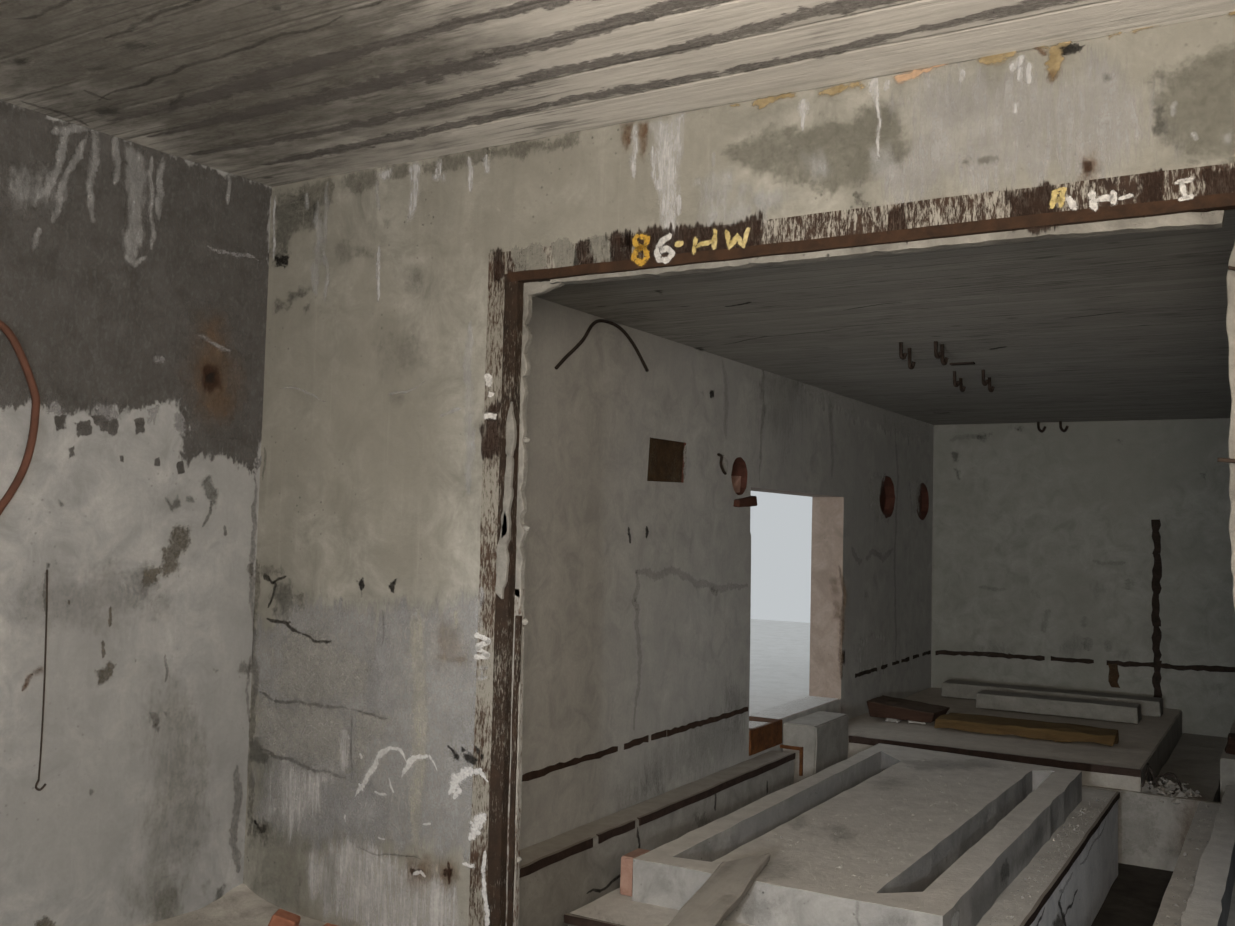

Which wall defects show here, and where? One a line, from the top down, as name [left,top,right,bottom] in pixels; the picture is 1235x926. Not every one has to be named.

damp [739,55,1139,204]
damp [632,115,683,232]
corrosion [605,211,771,262]
corrosion [888,203,908,243]
corrosion [1005,181,1060,235]
corrosion [1140,168,1163,217]
corrosion [1202,167,1235,211]
peeling [0,102,272,474]
corrosion [479,398,501,460]
spalling [142,476,217,584]
crack [263,574,331,643]
spalling [97,641,114,684]